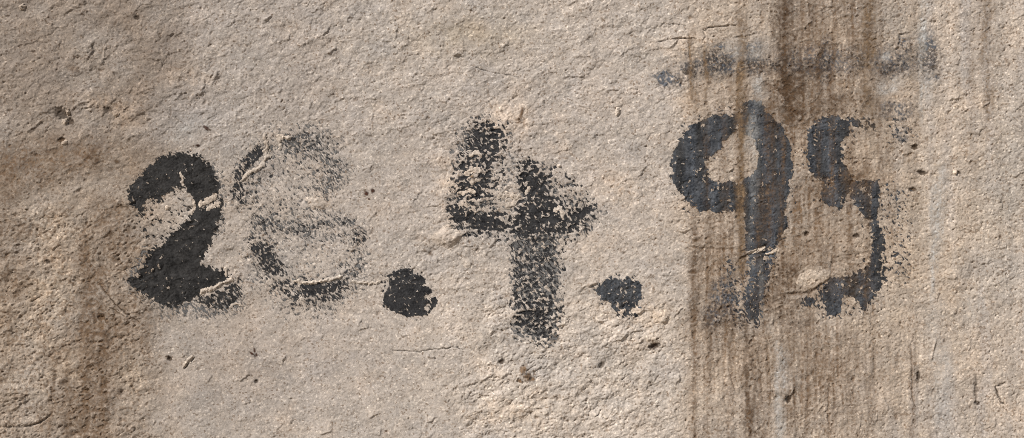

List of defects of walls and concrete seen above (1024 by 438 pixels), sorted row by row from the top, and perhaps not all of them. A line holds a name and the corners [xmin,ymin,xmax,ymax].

damp [737,0,858,162]
damp [765,173,832,299]
damp [691,229,843,436]